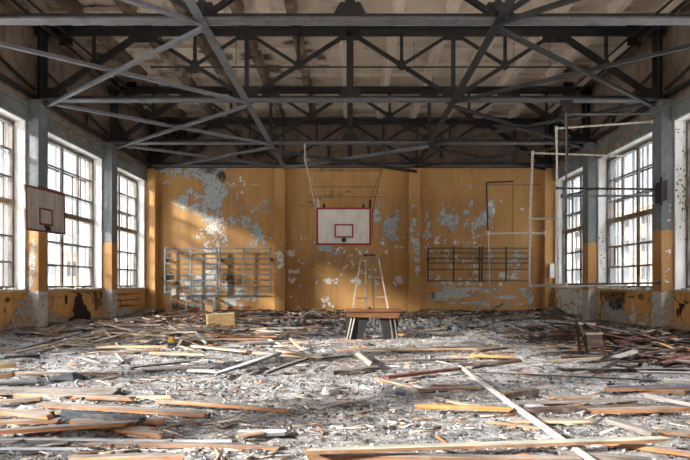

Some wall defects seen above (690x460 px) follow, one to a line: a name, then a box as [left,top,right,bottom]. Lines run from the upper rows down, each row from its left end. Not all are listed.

flaking render [48,293,91,323]
peeling [158,168,274,309]
peeling [275,192,542,312]
water stain [601,292,644,310]